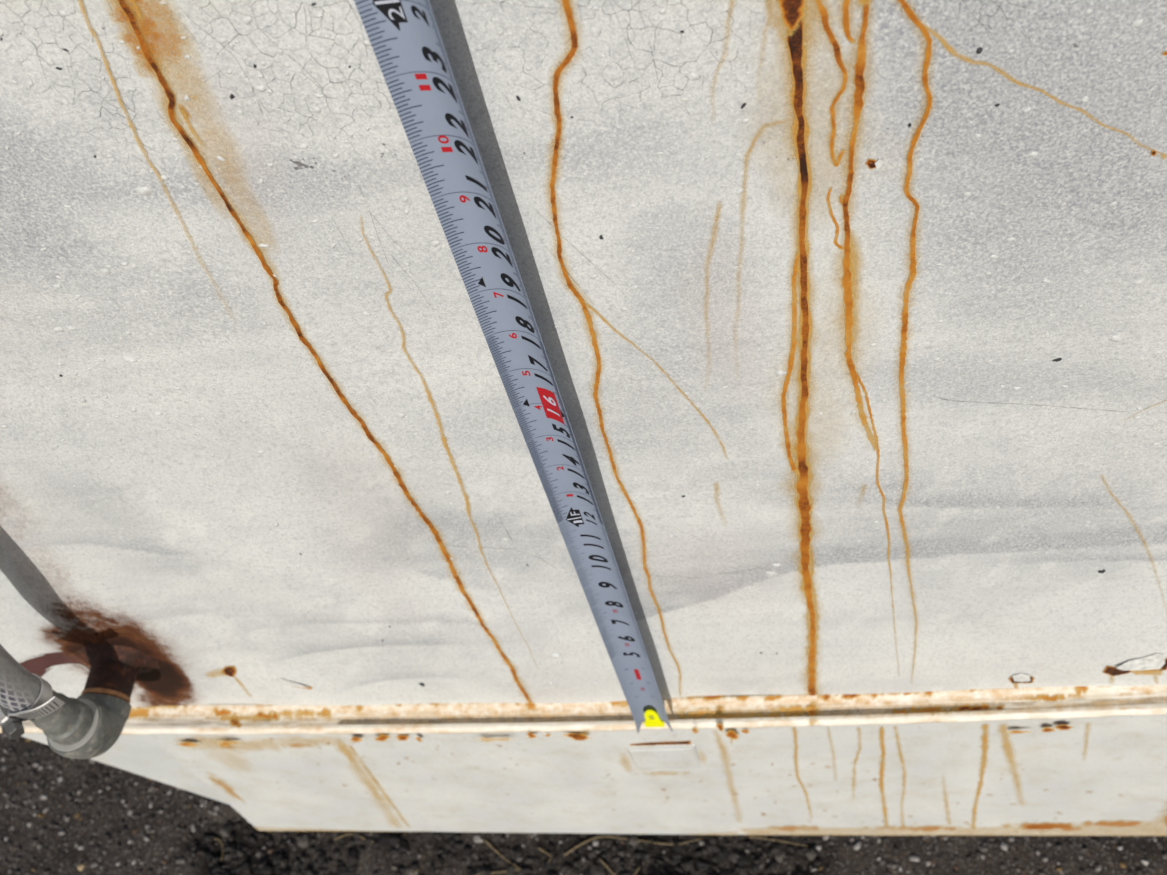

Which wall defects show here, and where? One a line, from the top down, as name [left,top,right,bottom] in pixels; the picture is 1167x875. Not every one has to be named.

corrosion [111,0,536,710]
corrosion [549,0,1150,836]
corrosion [42,597,194,719]
peeling [1103,653,1167,682]
corrosion [207,708,330,728]
corrosion [328,734,422,820]
corrosion [527,732,588,741]